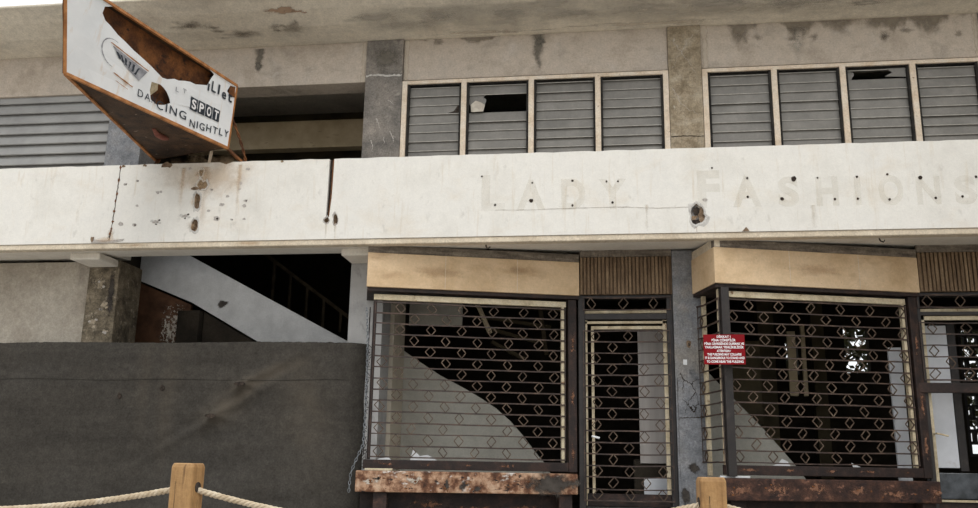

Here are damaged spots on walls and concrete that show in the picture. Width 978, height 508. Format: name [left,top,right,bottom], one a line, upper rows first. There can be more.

damp [534,29,549,64]
damp [730,24,756,40]
damp [785,19,852,48]
damp [869,15,948,38]
crack [107,165,122,239]
spalling [179,168,248,234]
crack [323,160,339,226]
spalling [688,198,710,229]
corrosion [443,478,481,492]
corrosion [502,465,580,496]
corrosion [852,486,942,498]